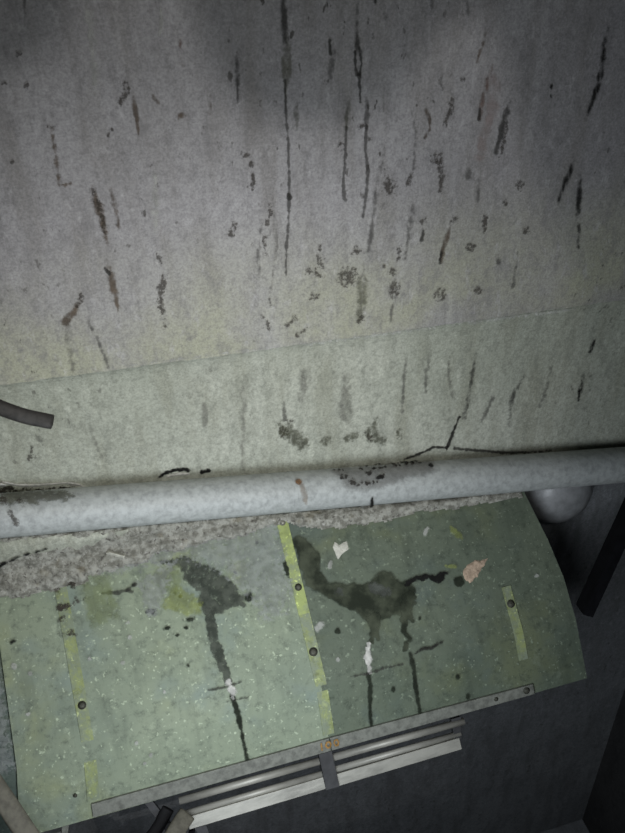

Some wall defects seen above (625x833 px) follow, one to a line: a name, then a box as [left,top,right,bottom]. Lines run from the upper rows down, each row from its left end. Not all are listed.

damp [354,35,362,103]
damp [587,38,606,114]
damp [494,108,509,158]
damp [430,153,445,193]
damp [91,188,107,240]
damp [62,293,84,326]
damp [104,268,119,308]
damp [156,275,167,328]
damp [383,249,401,297]
crack [406,416,551,459]
damp [293,536,465,727]
damp [152,556,253,761]